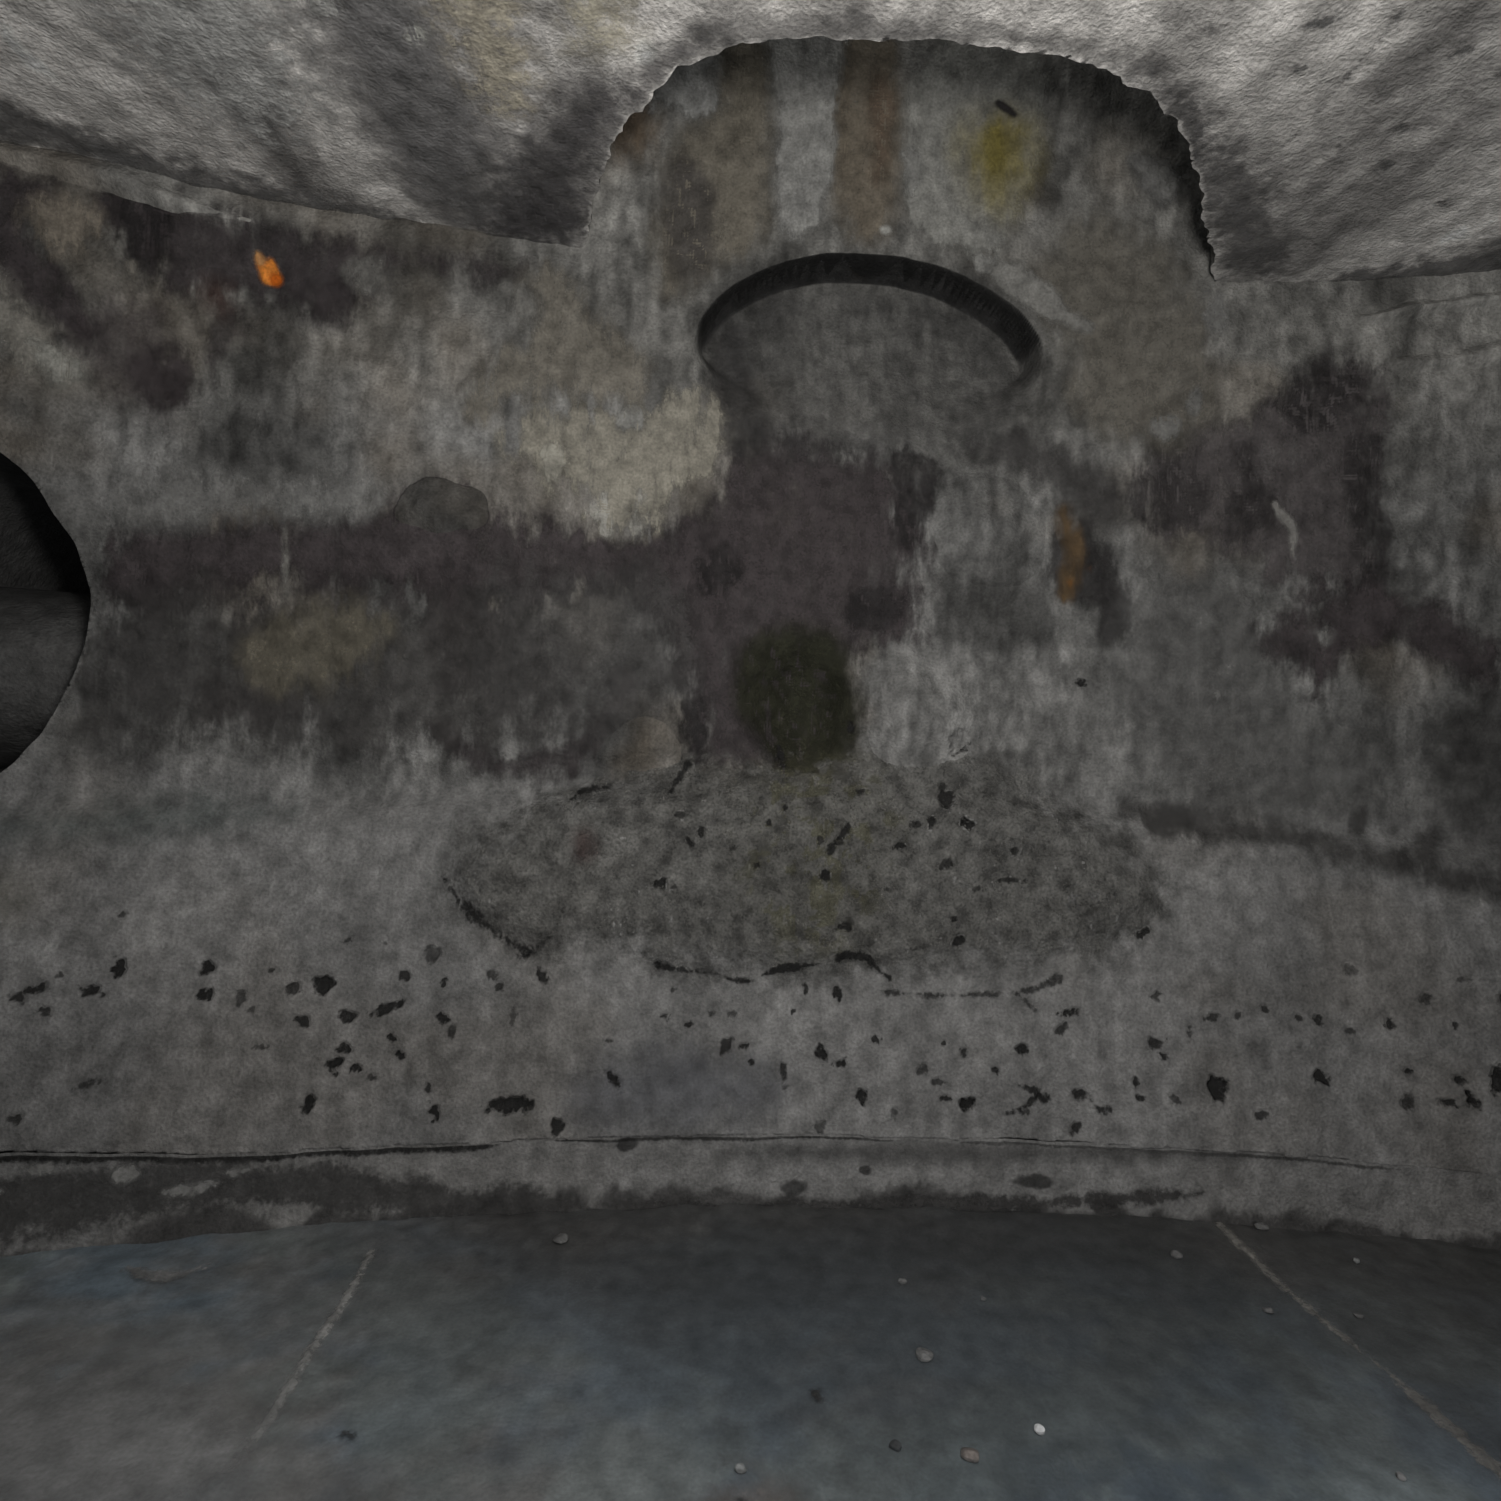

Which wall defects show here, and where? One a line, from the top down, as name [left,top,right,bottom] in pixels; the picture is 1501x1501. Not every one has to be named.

rust [256,253,282,286]
leakage [967,358,1501,897]
spalling [80,959,126,997]
spalling [196,960,215,1001]
spalling [286,975,336,996]
spalling [338,999,404,1024]
spalling [324,1042,376,1081]
spalling [815,1043,846,1067]
spalling [485,1096,534,1116]
spalling [917,1065,976,1112]
spalling [1207,1075,1229,1102]
spalling [1440,1063,1501,1111]